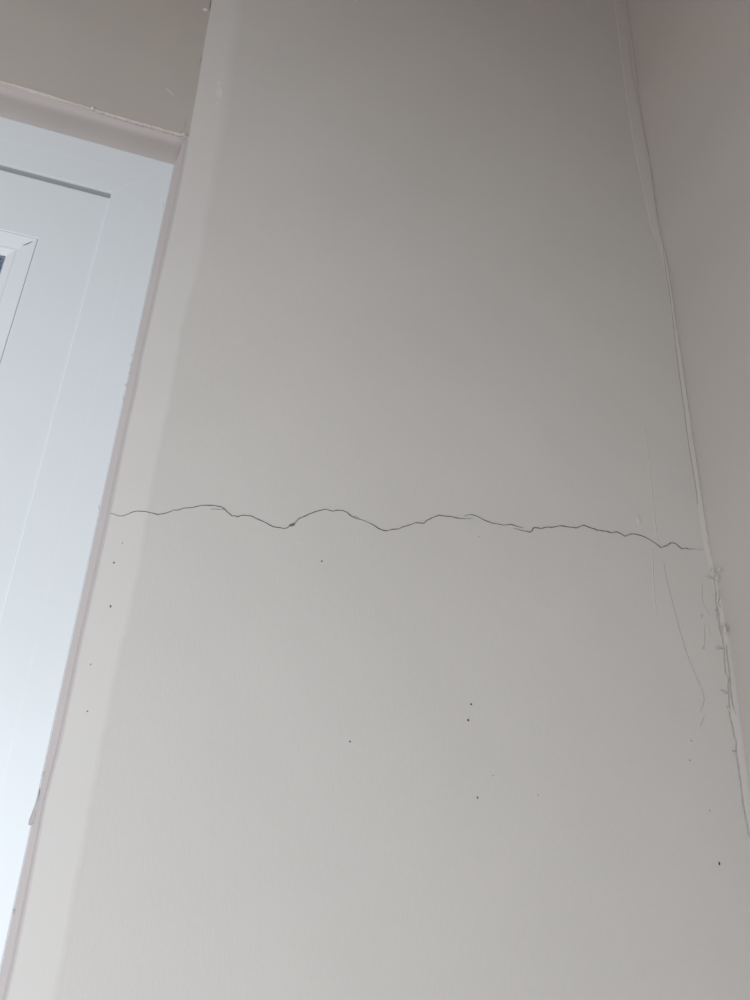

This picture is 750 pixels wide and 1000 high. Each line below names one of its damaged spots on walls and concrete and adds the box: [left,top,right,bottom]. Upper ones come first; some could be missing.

crack [110,40,711,725]